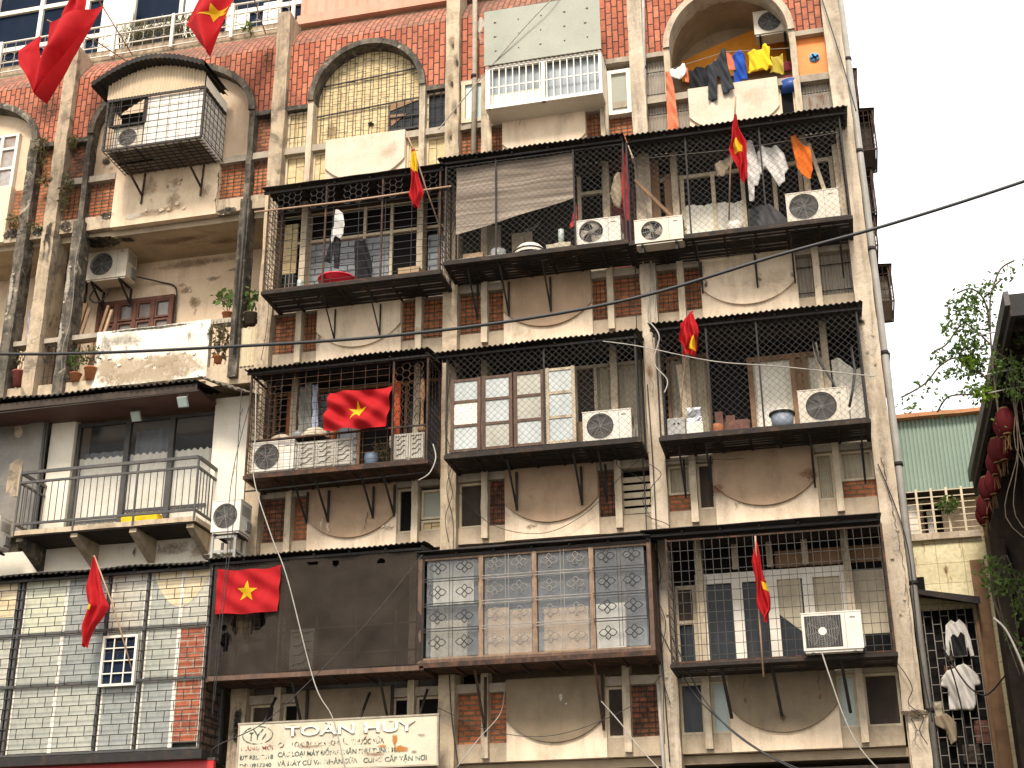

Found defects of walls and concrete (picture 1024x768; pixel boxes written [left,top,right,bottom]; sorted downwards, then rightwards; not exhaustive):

peeling [97,350,202,385]